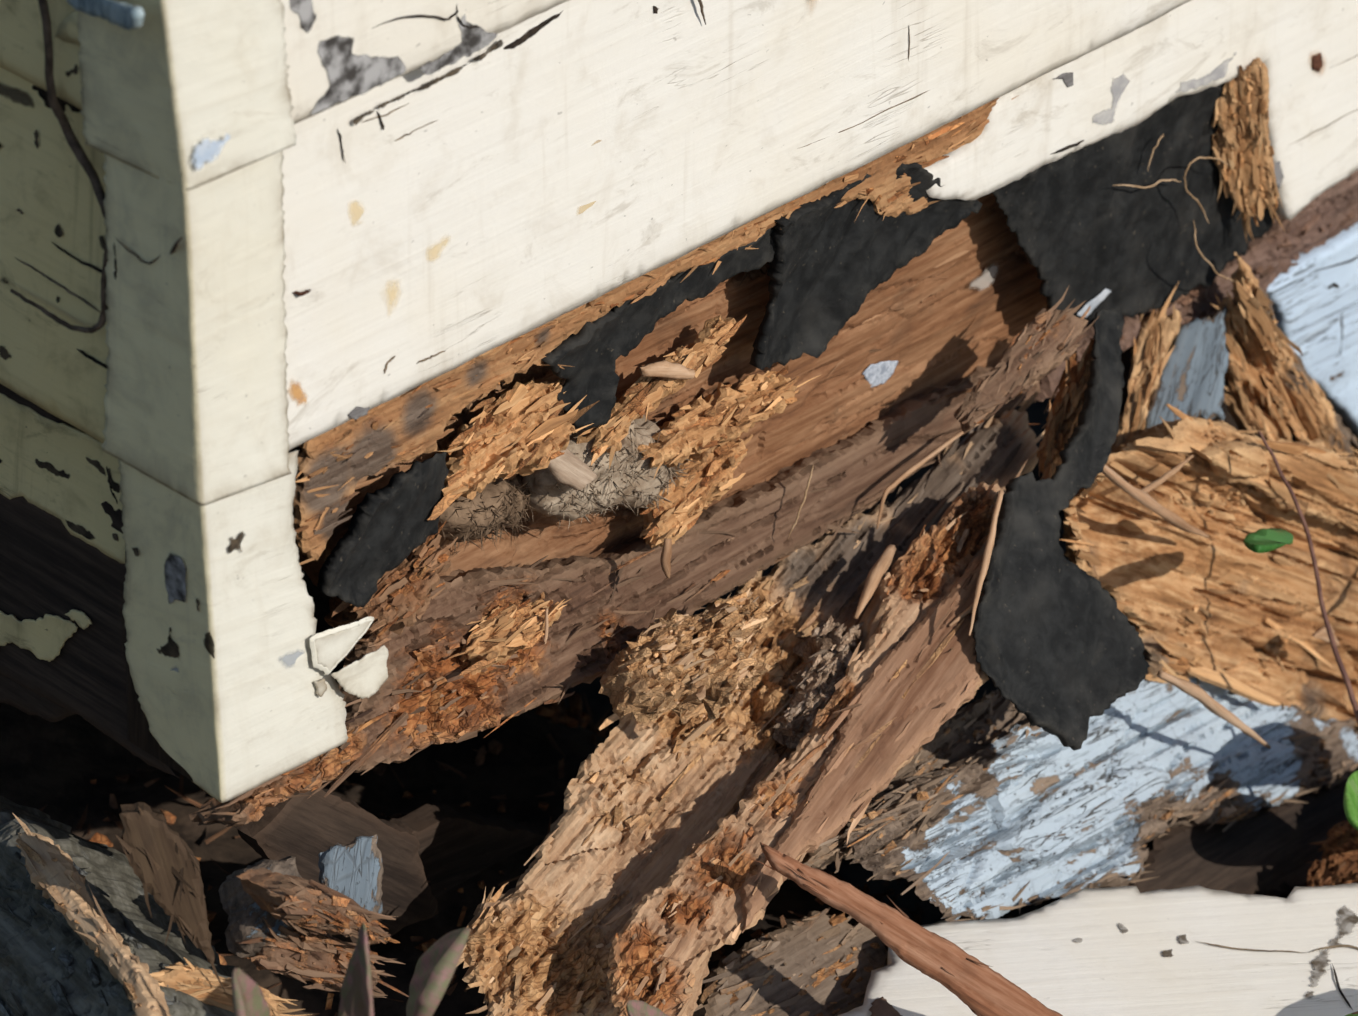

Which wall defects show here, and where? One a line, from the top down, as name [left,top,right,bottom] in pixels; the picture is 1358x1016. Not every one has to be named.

peeling [290,0,503,125]
peeling [1274,161,1284,188]
peeling [348,406,370,420]
peeling [164,554,200,611]
peeling [228,532,245,553]
peeling [0,494,179,778]
peeling [203,632,215,659]
peeling [310,616,389,699]
spalling [819,736,1008,896]
spalling [1064,699,1358,892]
spalling [944,882,1049,922]
peeling [1305,905,1358,1010]